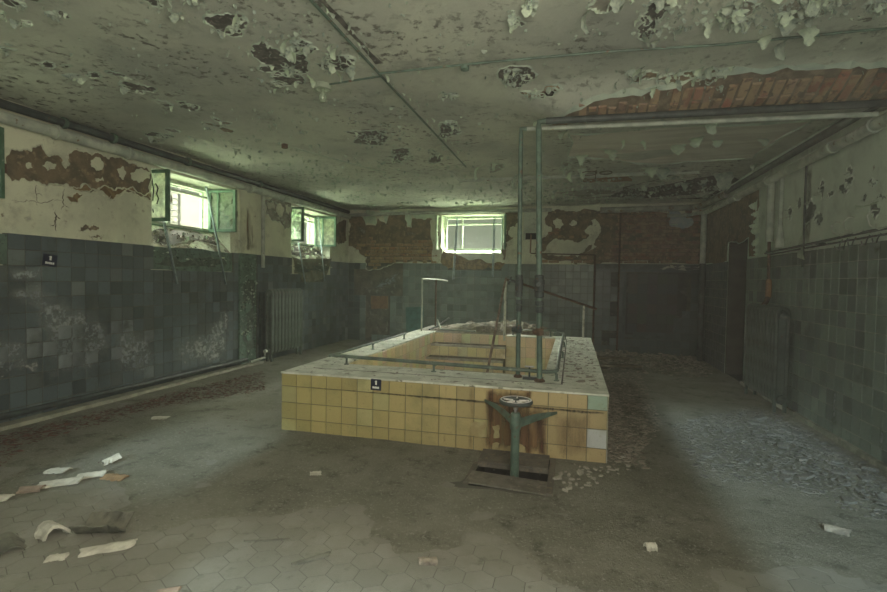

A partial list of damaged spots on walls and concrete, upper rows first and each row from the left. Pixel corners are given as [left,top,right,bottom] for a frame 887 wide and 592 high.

spalling [5,144,153,204]
flaking render [36,0,543,271]
peeling [291,244,332,283]
flaking render [485,0,887,287]